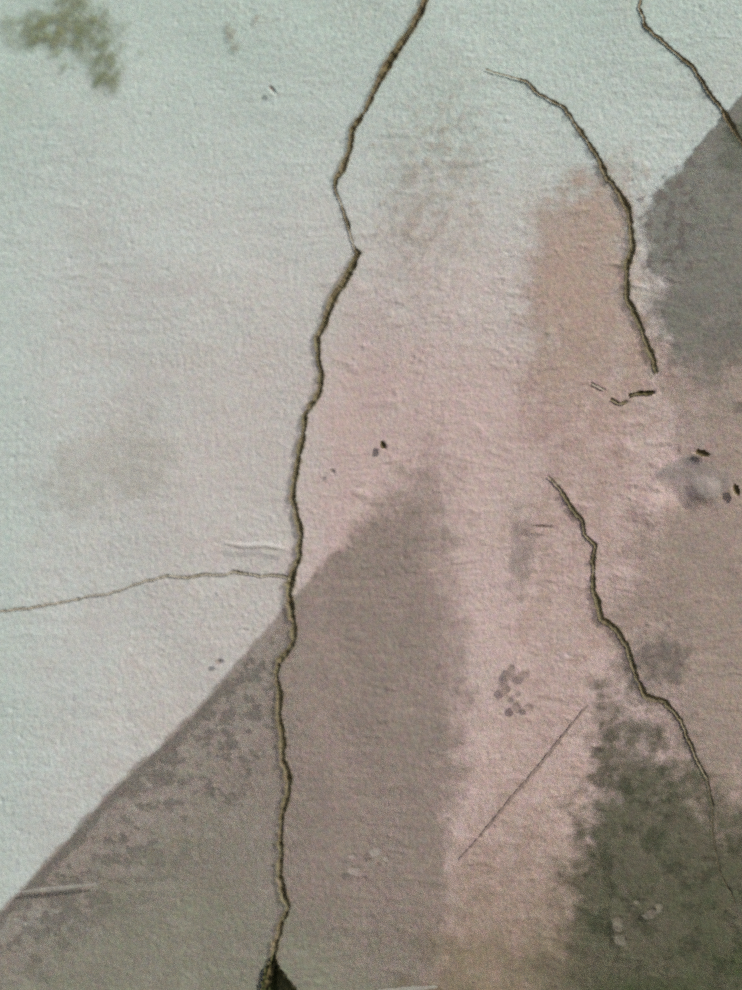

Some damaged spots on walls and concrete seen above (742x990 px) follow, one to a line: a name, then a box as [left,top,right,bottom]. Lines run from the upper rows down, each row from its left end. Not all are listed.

mould [23,0,119,84]
crack [486,68,658,405]
crack [638,0,742,145]
water stain [645,96,742,368]
crack [0,0,428,990]
water stain [0,507,455,990]
crack [548,476,736,904]
spalling [261,954,296,990]